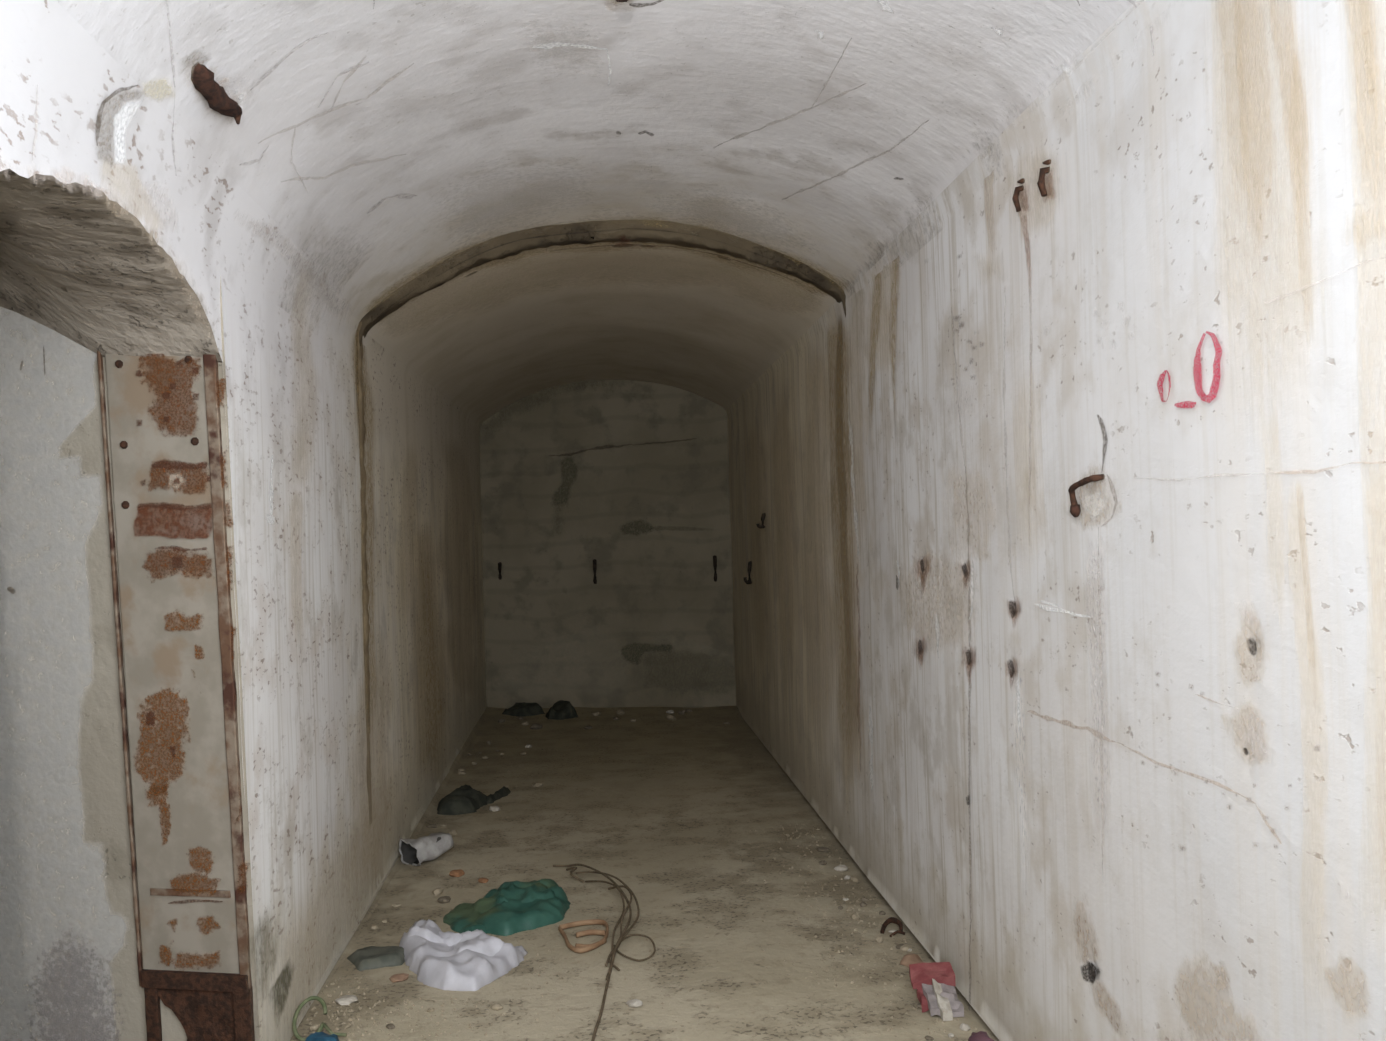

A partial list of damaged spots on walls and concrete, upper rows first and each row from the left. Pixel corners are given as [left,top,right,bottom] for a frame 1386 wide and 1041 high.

rust [1012,159,1051,212]
rust [216,378,226,407]
rust [135,450,233,590]
rust [164,612,204,672]
rust [135,689,190,844]
rust [237,863,250,892]
rust [160,847,222,969]